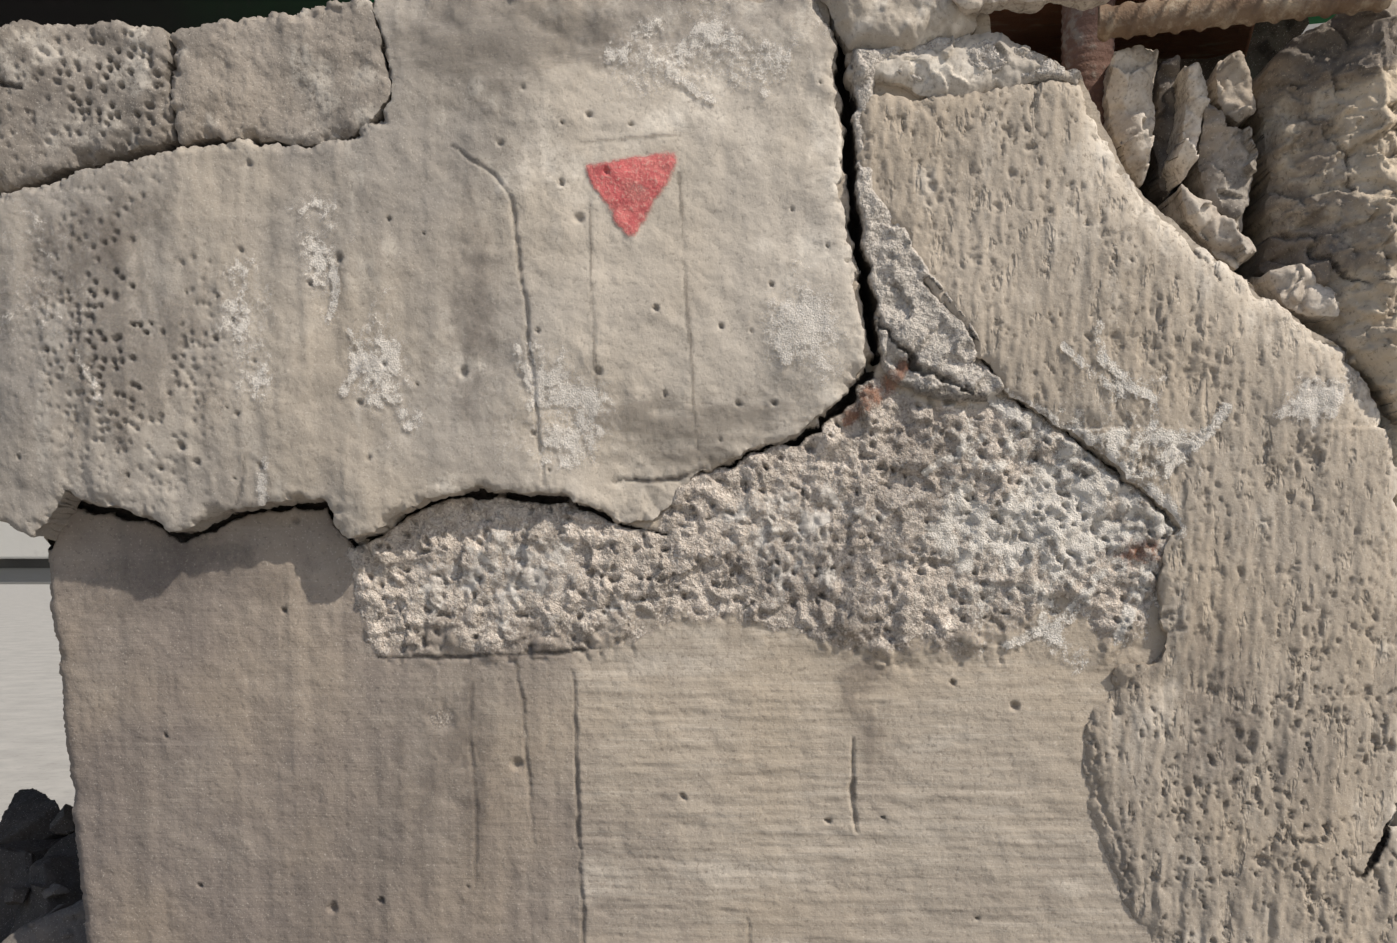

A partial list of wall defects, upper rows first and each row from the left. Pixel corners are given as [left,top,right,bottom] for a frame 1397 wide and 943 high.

spalling [1097,0,1392,233]
damp [291,197,341,320]
crack [78,488,667,548]
damp [339,313,423,431]
damp [513,340,614,470]
crack [628,475,687,483]
spalling [347,37,1168,656]
crack [718,24,995,469]
crack [1017,401,1120,475]
damp [921,320,1232,673]
spalling [1248,263,1340,324]
crack [1361,820,1397,877]